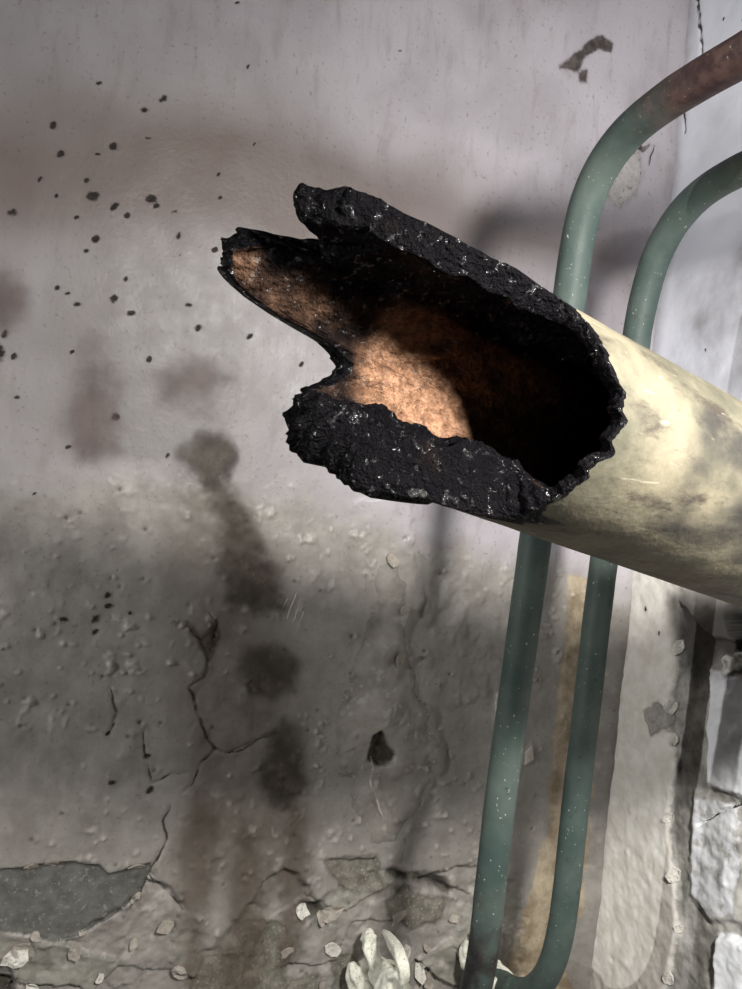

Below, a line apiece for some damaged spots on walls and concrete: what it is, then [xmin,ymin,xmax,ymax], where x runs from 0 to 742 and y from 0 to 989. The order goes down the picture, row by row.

damp [166,435,281,609]
damp [91,592,112,635]
crack [109,688,117,734]
crack [143,611,273,787]
damp [242,647,297,698]
damp [262,724,304,807]
peeling [0,859,151,989]
crack [131,807,183,909]
spalling [171,919,356,989]
spalling [296,902,345,927]
spalling [325,854,460,929]
spalling [404,944,433,989]